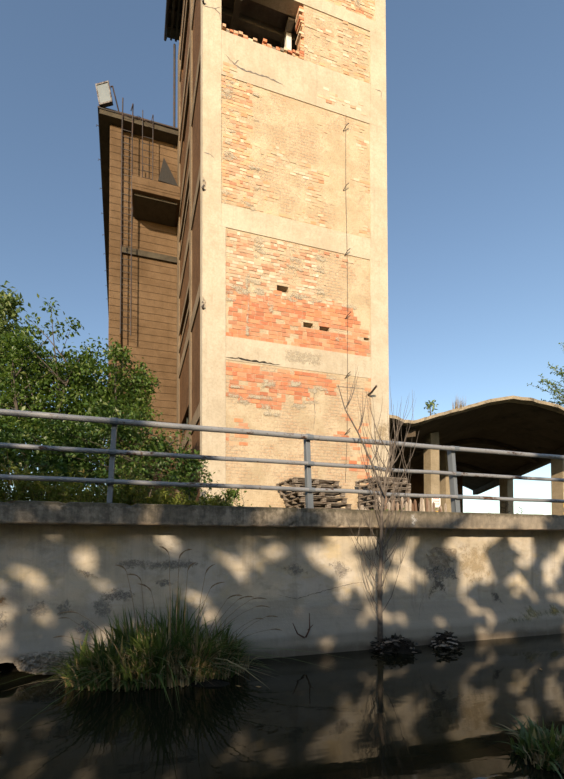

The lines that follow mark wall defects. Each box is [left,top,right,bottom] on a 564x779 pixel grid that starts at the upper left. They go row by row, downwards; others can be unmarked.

flaking render [326,0,375,20]
crack [226,55,283,85]
flaking render [304,12,370,83]
flaking render [221,61,292,219]
flaking render [226,230,371,357]
flaking render [226,362,340,416]
flaking render [226,418,249,446]
flaking render [333,414,372,485]
peeling [426,547,457,570]